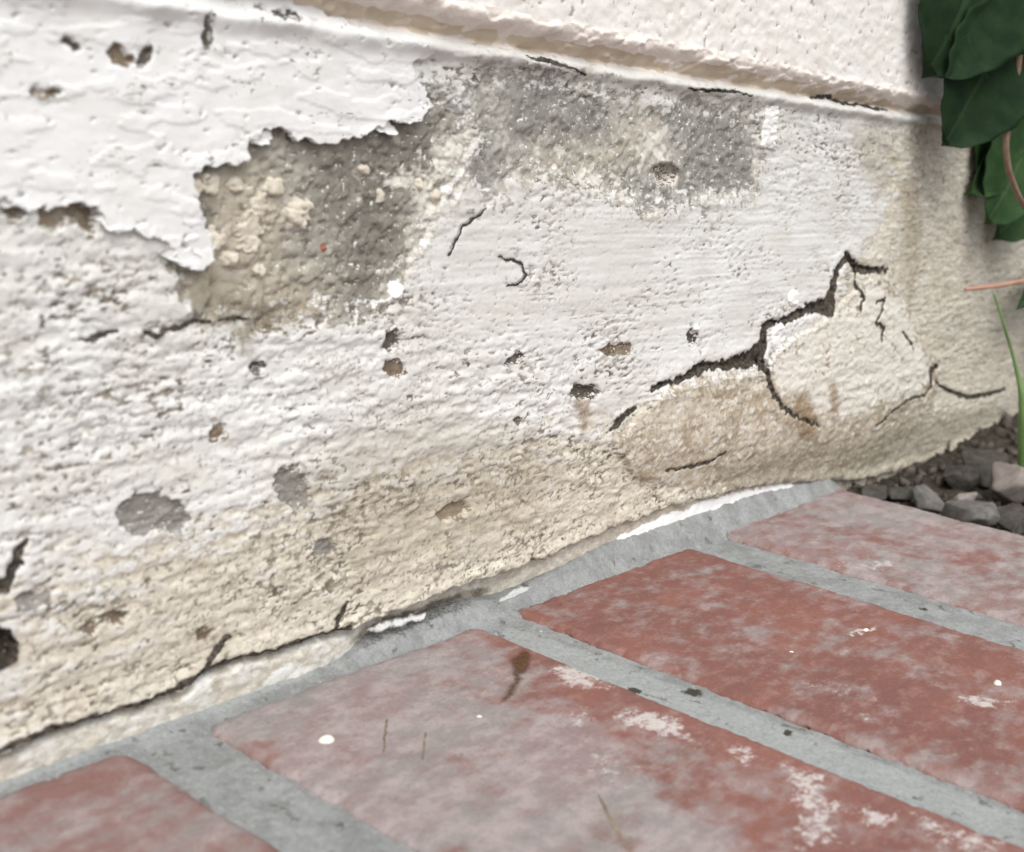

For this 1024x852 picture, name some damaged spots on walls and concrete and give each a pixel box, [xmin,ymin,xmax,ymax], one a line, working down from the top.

peeling [0,0,767,343]
crack [448,207,487,256]
crack [498,255,528,287]
crack [609,251,1006,431]
peeling [116,491,191,536]
crack [0,601,352,753]